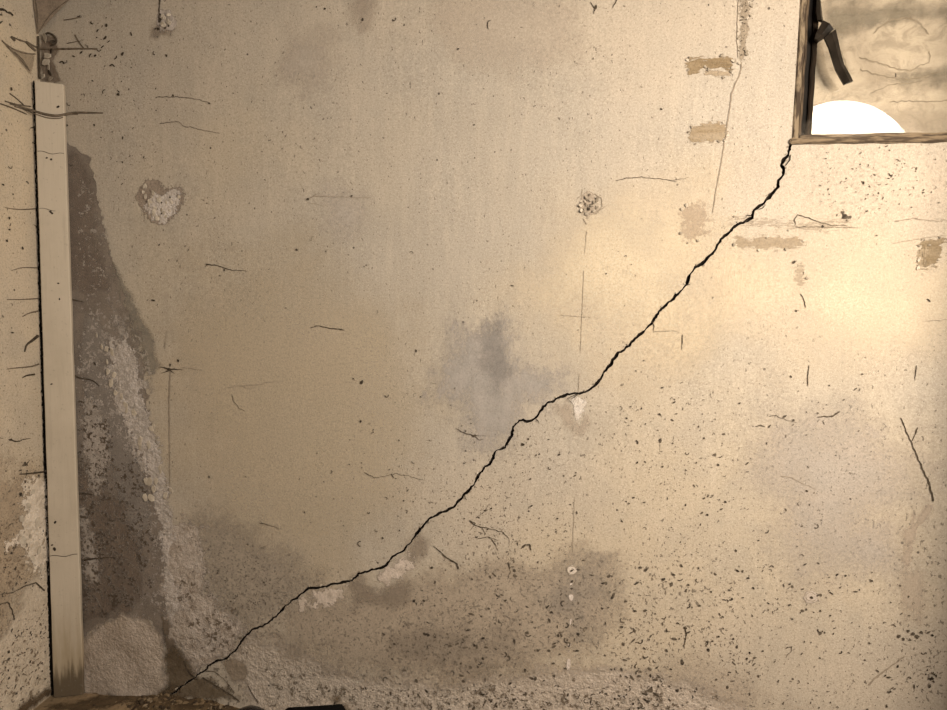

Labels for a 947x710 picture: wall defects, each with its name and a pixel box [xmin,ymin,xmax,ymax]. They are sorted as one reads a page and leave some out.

leakage [0,471,52,710]
spalling [135,179,186,225]
leakage [67,143,747,710]
crack [163,145,792,704]